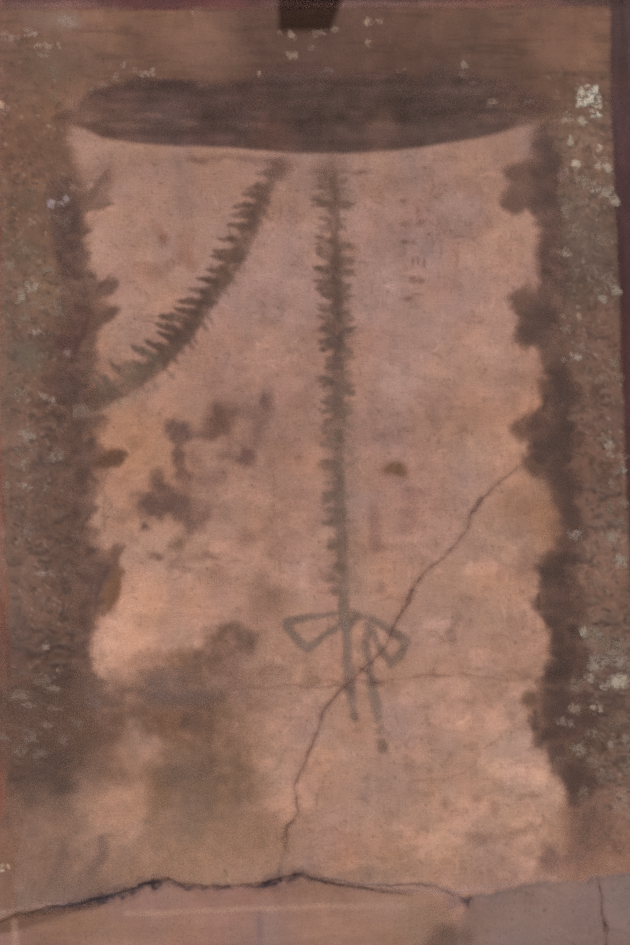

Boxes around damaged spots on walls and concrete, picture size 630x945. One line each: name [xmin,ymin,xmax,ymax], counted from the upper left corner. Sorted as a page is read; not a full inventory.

crack [1,879,189,922]
crack [256,873,341,888]